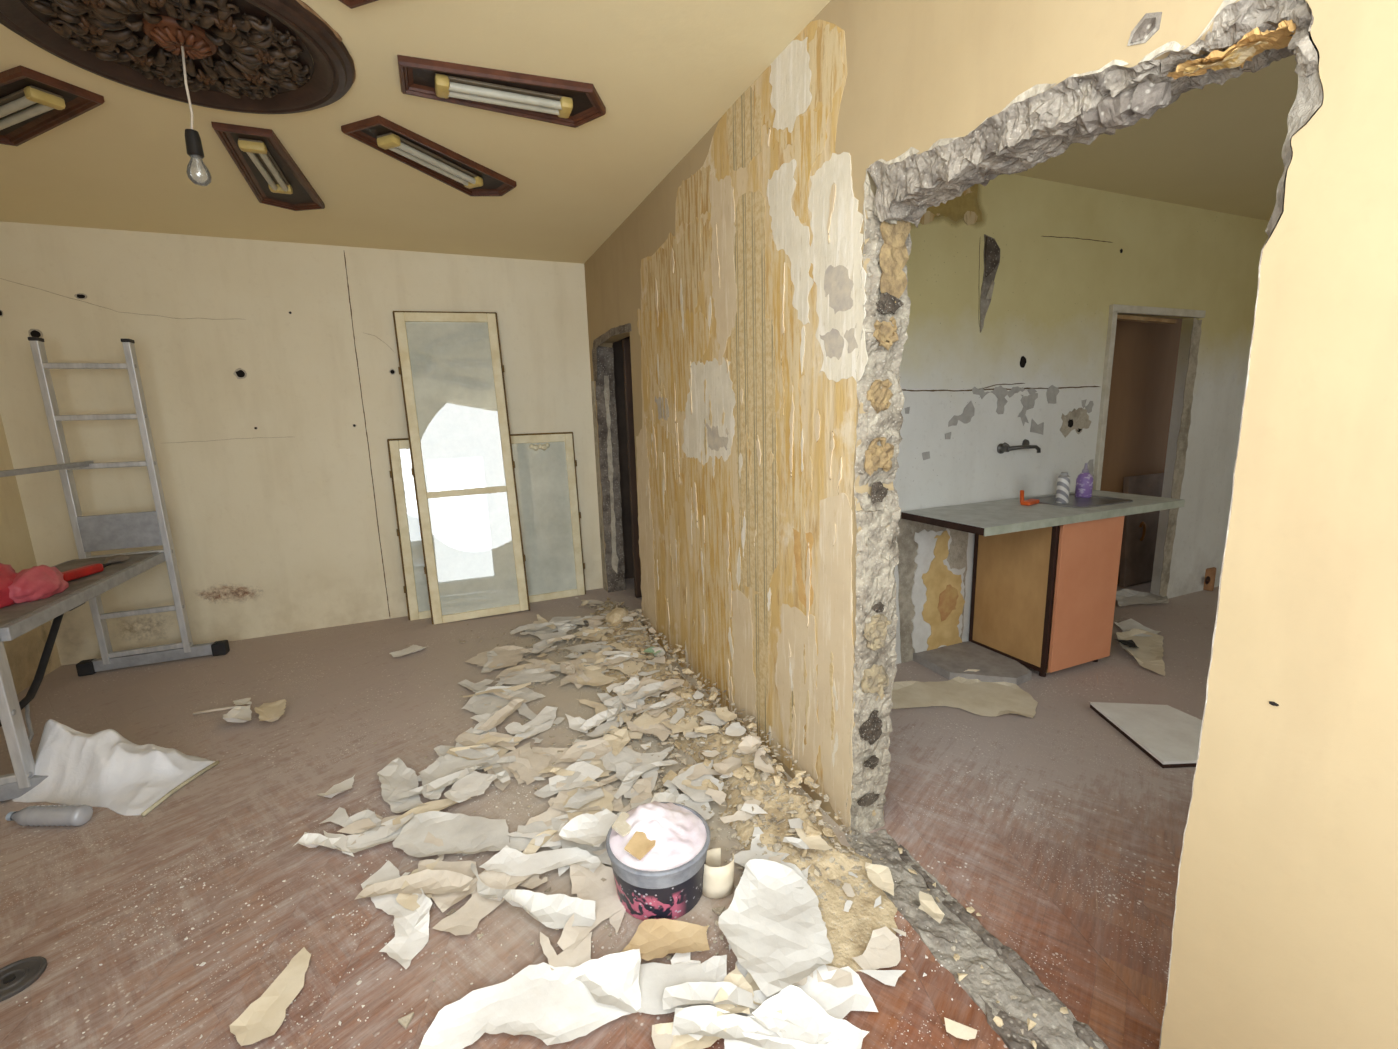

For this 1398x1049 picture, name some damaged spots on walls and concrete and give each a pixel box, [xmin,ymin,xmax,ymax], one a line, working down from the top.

flaking render [767,37,812,148]
spalling [1127,12,1162,46]
flaking render [920,184,1000,332]
flaking render [646,152,868,645]
peeling [945,385,1094,439]
spalling [1159,318,1202,597]
flaking render [896,515,969,663]
peeling [99,840,294,981]
peeling [284,924,427,1049]